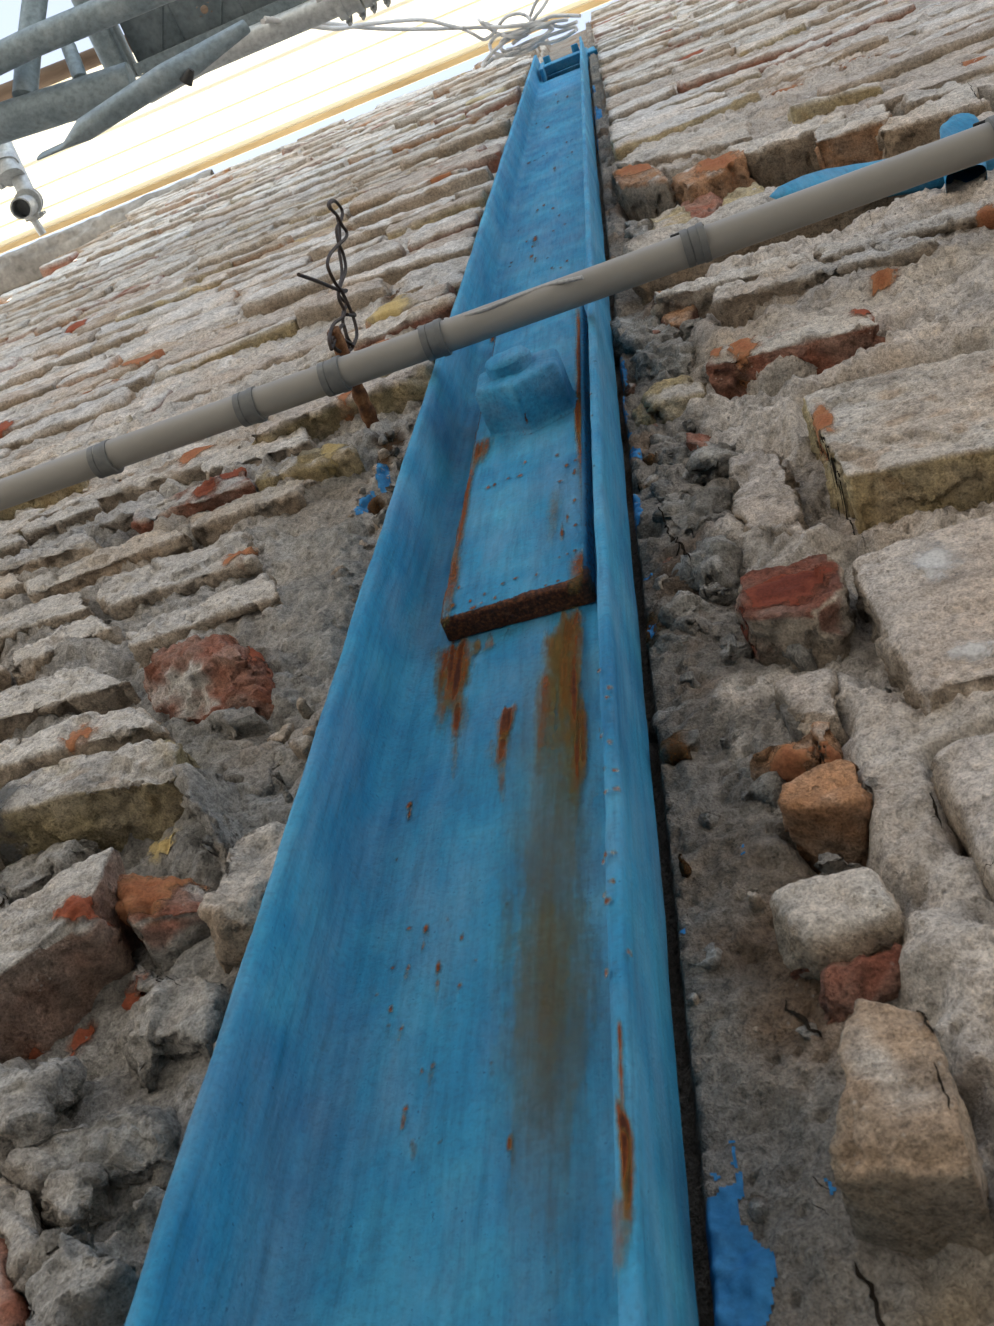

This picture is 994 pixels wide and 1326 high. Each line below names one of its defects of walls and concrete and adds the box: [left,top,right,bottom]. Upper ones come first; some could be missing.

corrosion [555,311,593,482]
corrosion [443,438,517,620]
corrosion [535,549,583,586]
crack [811,414,866,550]
corrosion [435,637,493,760]
corrosion [496,703,516,789]
corrosion [538,610,611,792]
crack [916,1010,950,1109]
corrosion [613,1022,634,1265]
crack [853,1261,885,1326]